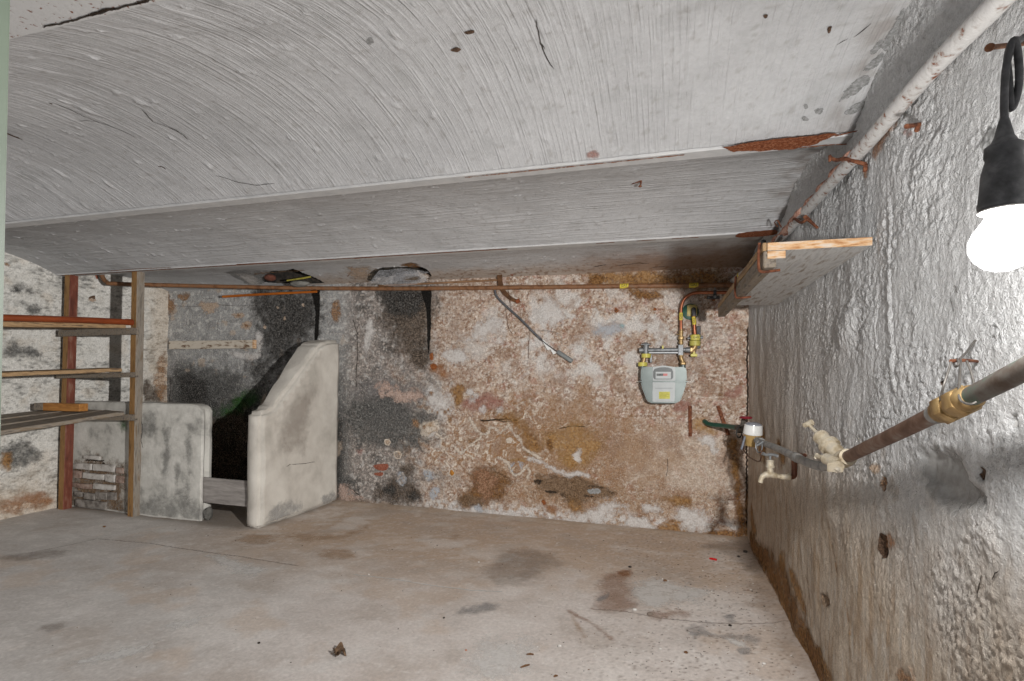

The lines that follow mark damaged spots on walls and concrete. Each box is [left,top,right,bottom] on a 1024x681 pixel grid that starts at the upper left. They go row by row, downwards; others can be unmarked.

crack [43,0,150,28]
crack [536,21,553,67]
rust [723,130,858,243]
damp [588,271,727,300]
efflorescence [364,320,373,350]
damp [421,290,432,353]
damp [347,385,601,478]
mould [374,464,421,503]
damp [449,456,531,517]
damp [555,495,618,522]
damp [627,436,757,537]
flaking render [878,533,894,559]